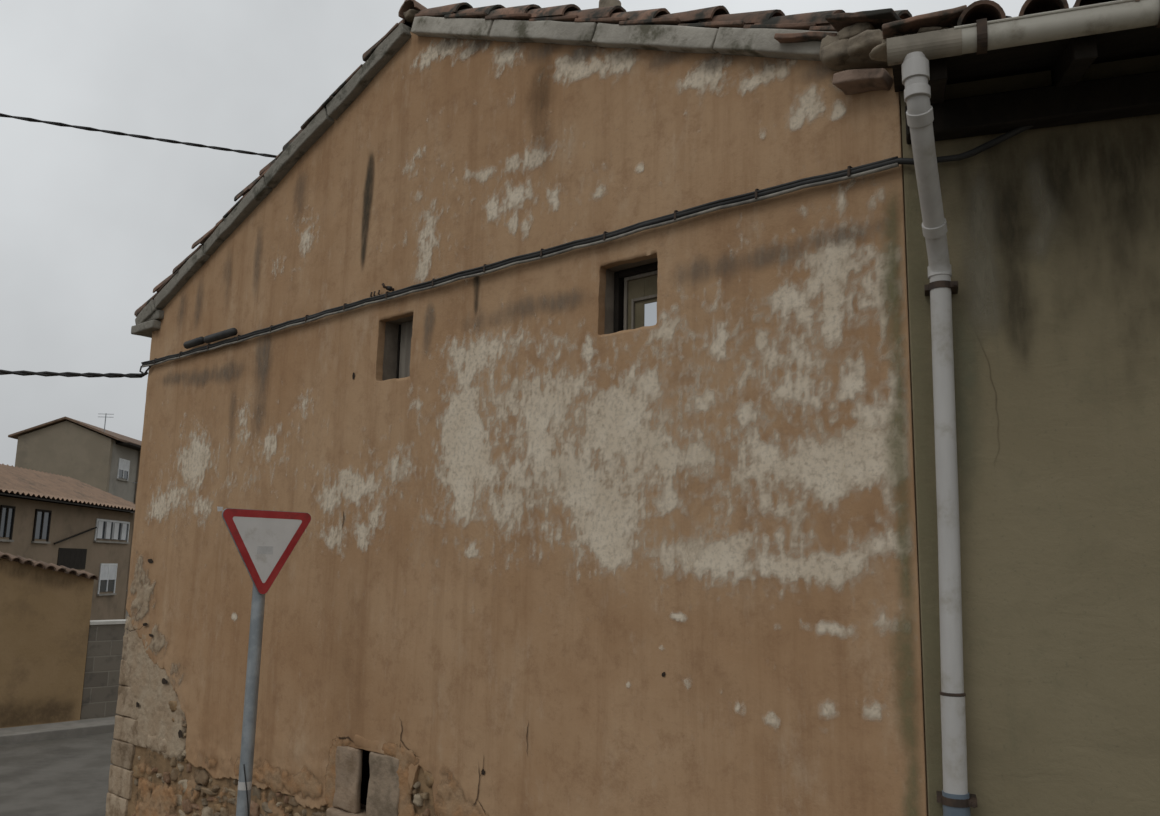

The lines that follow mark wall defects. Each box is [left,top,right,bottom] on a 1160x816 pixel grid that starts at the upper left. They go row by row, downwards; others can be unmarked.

peeling [413,38,522,77]
peeling [555,48,636,83]
peeling [678,57,729,93]
peeling [740,60,796,94]
peeling [465,149,553,237]
peeling [404,180,910,595]
peeling [238,390,308,461]
peeling [148,431,220,523]
peeling [317,444,414,552]
peeling [816,621,853,637]
flaking render [117,552,329,816]
flaking render [410,766,437,816]